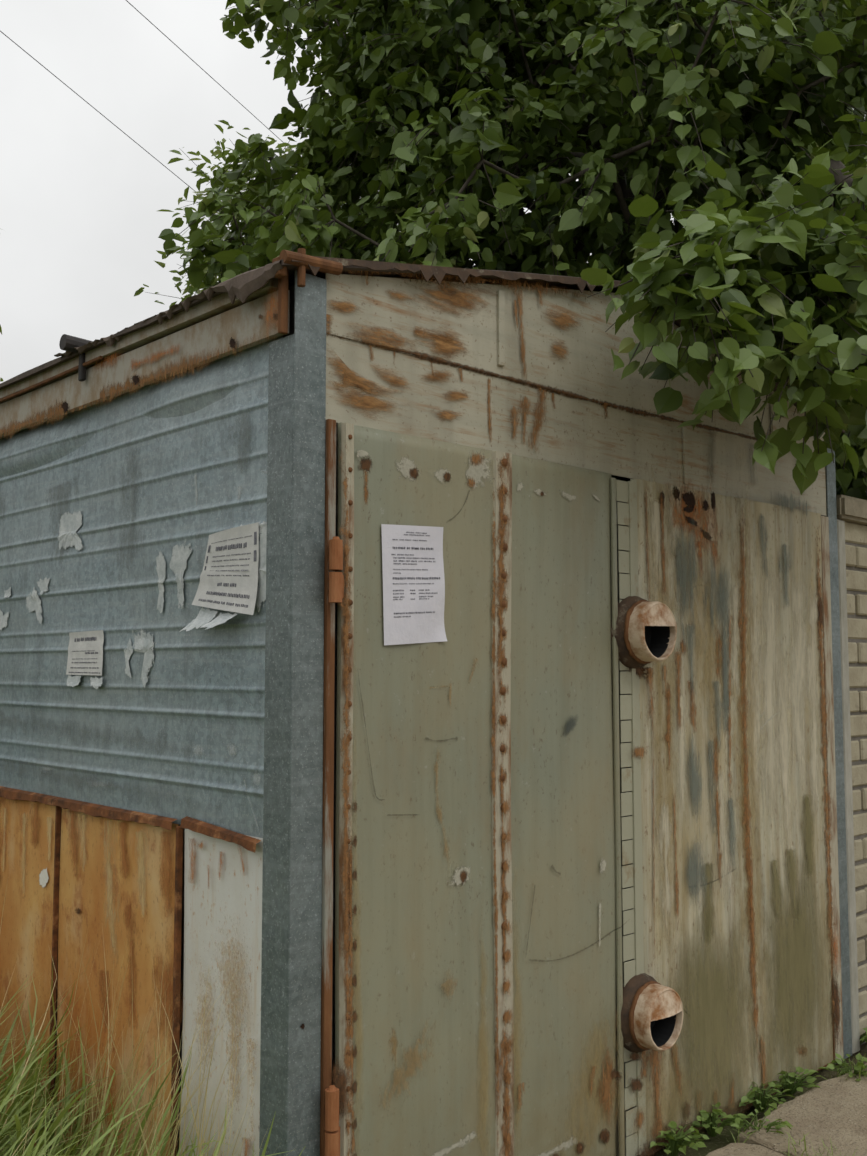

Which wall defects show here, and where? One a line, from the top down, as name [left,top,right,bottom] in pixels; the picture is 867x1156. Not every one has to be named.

rust [0,347,236,437]
rust [326,301,356,339]
rust [360,458,372,503]
rust [332,270,757,449]
rust [645,493,717,598]
rust [333,446,357,1156]
rust [491,457,524,1156]
rust [590,510,783,1156]
rust [817,537,840,1042]